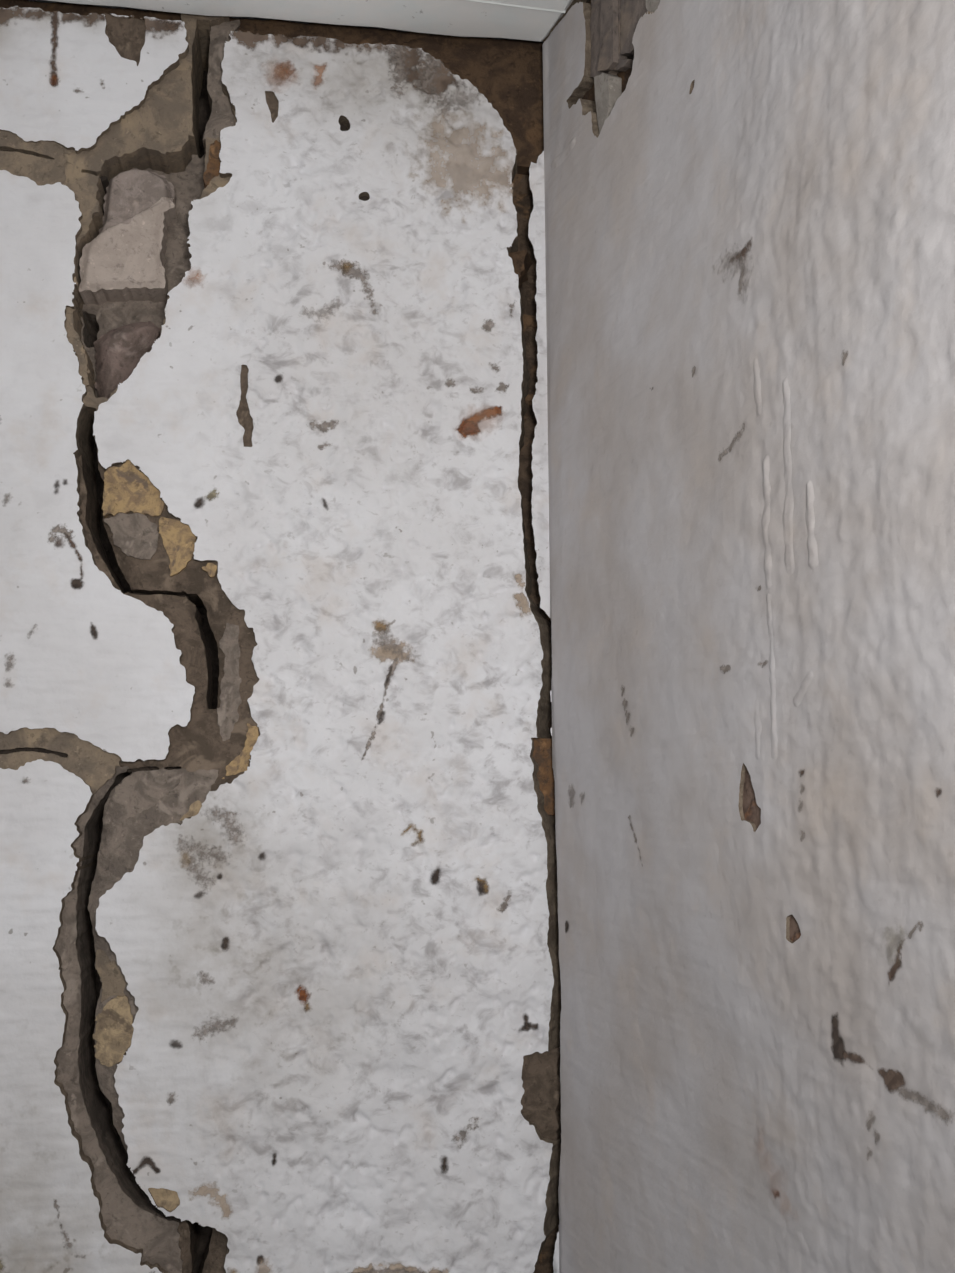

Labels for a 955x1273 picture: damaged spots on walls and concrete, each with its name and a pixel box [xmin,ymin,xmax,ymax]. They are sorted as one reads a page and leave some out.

flaking render [402,34,544,175]
peeling [582,0,660,133]
flaking render [0,13,240,421]
peeling [236,366,254,447]
crack [508,174,551,624]
crack [94,444,147,595]
flaking render [0,448,260,1273]
crack [533,712,555,815]
peeling [742,768,761,828]
crack [521,1046,561,1140]
crack [133,1157,160,1175]
crack [533,1225,559,1273]